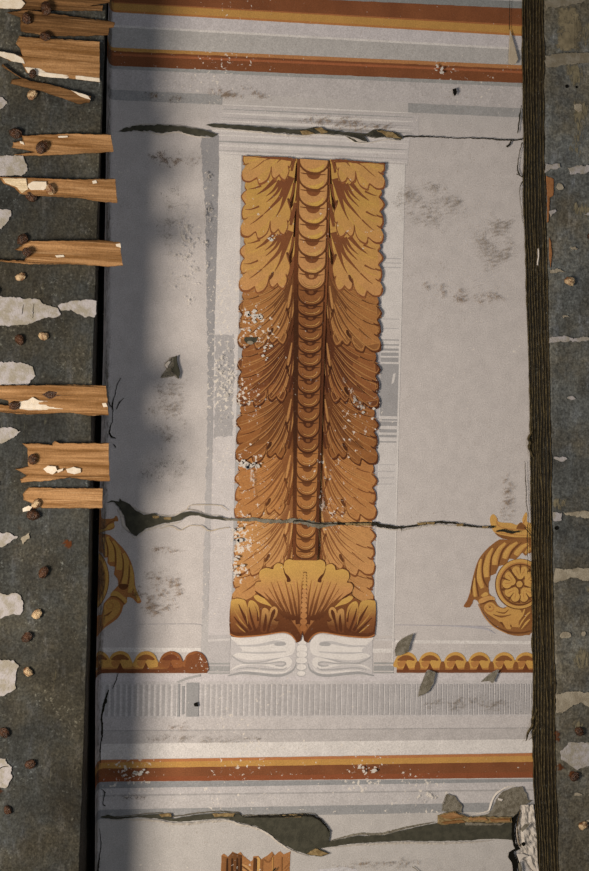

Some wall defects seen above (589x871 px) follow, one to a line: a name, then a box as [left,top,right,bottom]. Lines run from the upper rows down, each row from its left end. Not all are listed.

spalling [160,356,180,379]
crack [109,378,124,448]
crack [107,463,531,572]
spalling [394,634,413,656]
spalling [418,670,436,697]
crack [99,674,118,763]
spalling [442,794,462,813]
spalling [477,785,531,817]